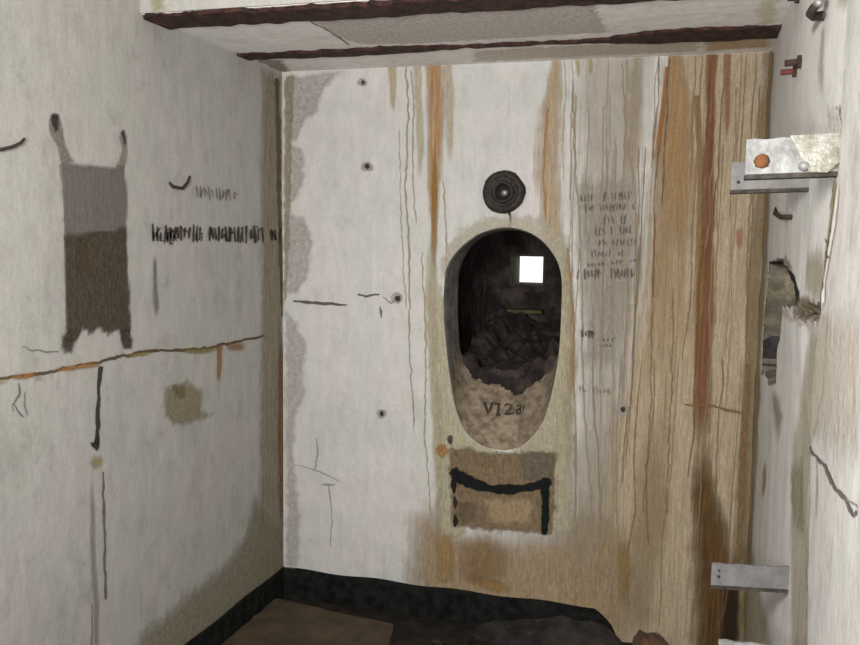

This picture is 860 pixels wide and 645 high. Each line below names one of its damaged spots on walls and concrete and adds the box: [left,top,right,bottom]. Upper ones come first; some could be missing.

crack [0,335,264,645]
leakage [142,60,286,645]
peeling [286,320,305,566]
peeling [283,74,333,297]
crack [315,439,336,546]
corrosion [415,65,452,510]
corrosion [540,61,561,251]
corrosion [563,248,575,439]
corrosion [653,54,730,429]
corrosion [692,458,738,645]
corrosion [739,364,750,526]
crack [810,446,857,517]